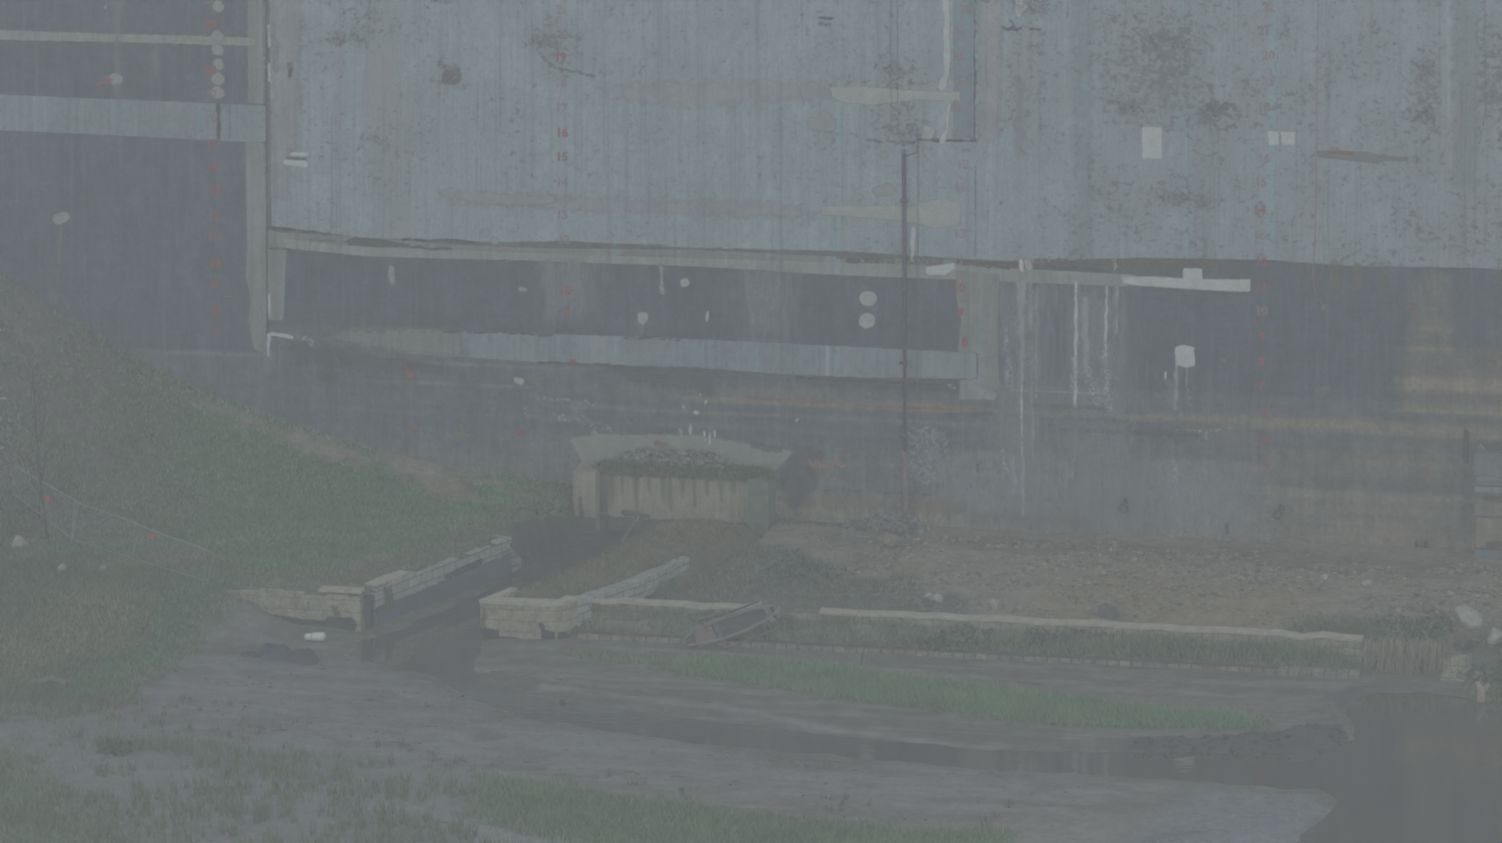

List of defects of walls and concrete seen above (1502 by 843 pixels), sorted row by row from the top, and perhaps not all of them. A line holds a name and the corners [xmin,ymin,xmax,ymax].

leakage [524,394,822,534]
leakage [949,229,1231,516]